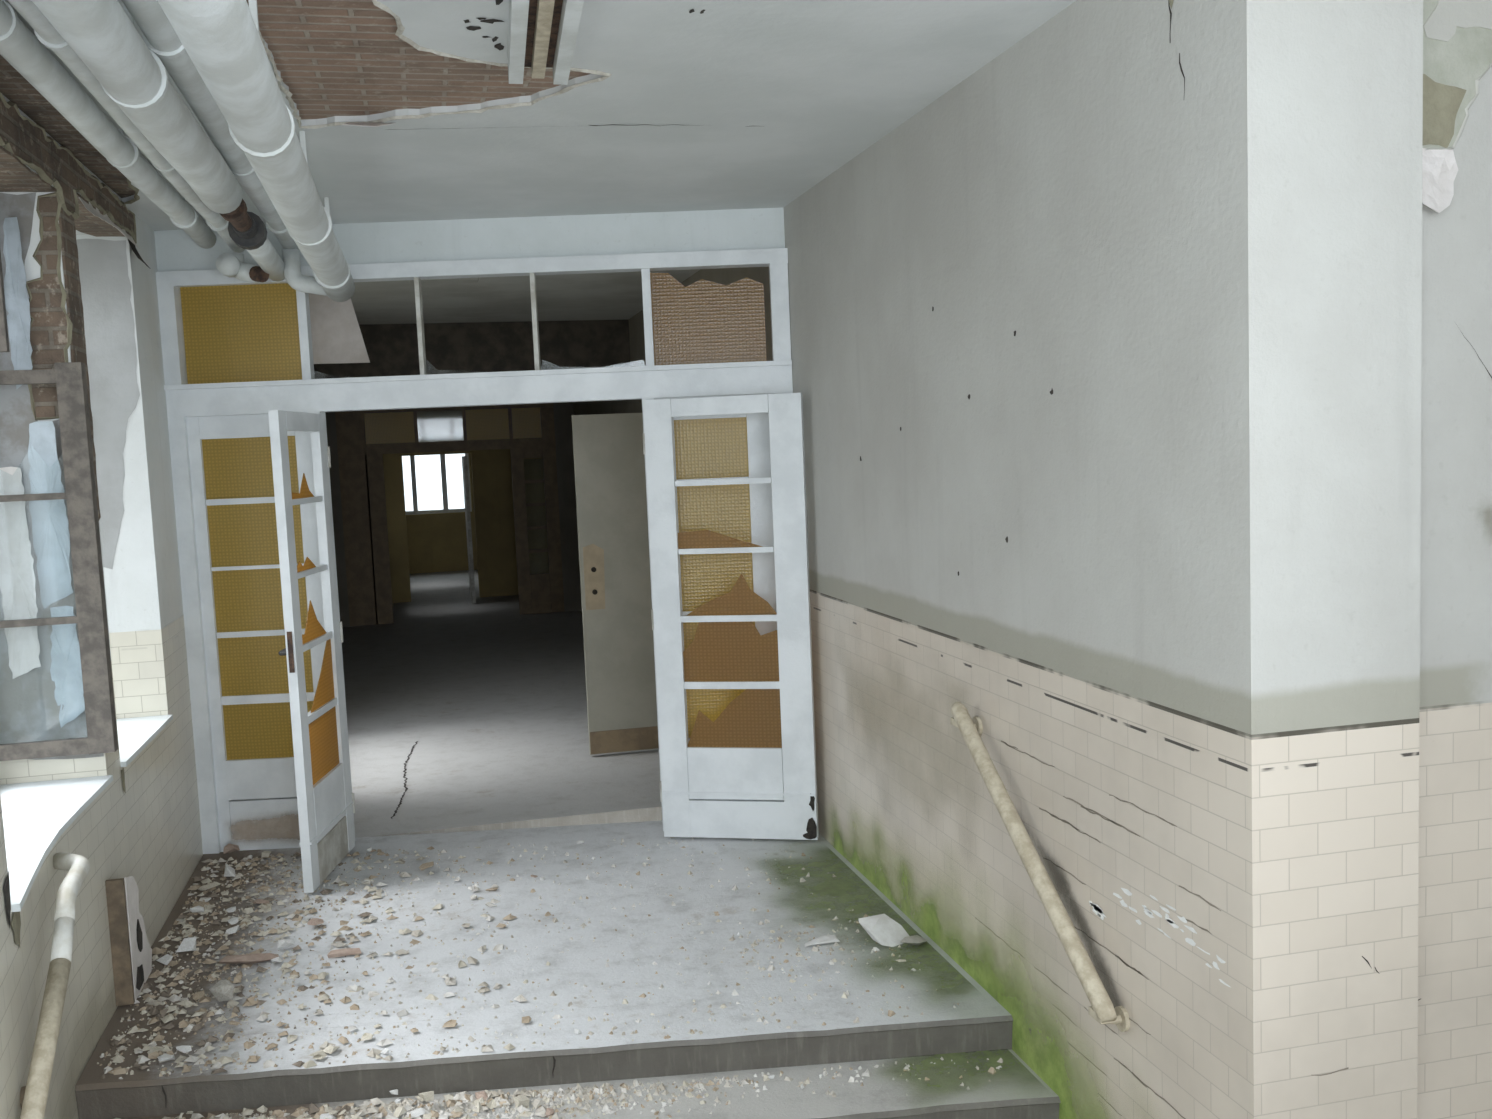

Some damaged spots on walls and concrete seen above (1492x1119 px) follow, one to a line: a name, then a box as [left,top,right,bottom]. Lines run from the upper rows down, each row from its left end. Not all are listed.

spalling [246,0,611,129]
peeling [1422,0,1492,213]
peeling [0,55,150,760]
spalling [4,871,21,947]